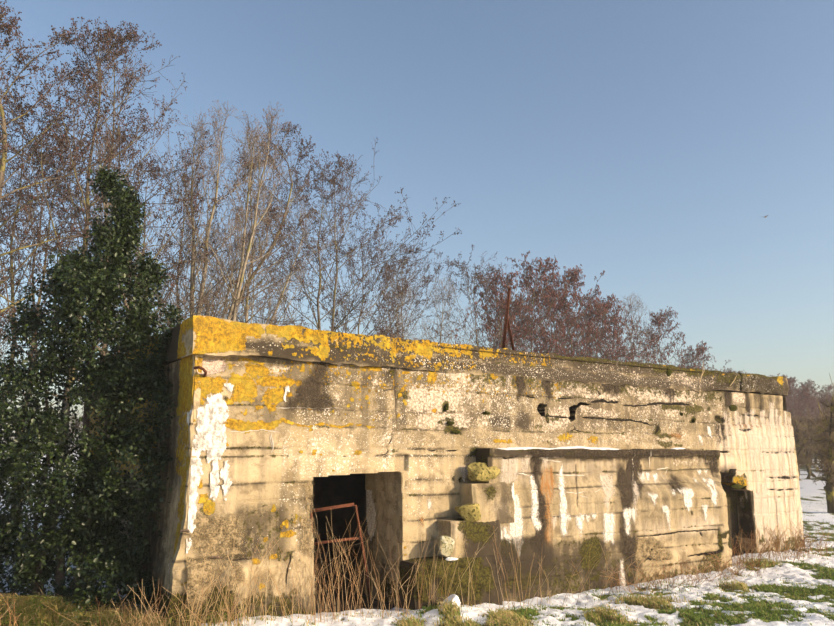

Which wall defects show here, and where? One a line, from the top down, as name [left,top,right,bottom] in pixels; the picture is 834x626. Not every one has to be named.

crack [546,391,690,434]
corrosion [540,466,555,546]
leakage [501,392,803,586]